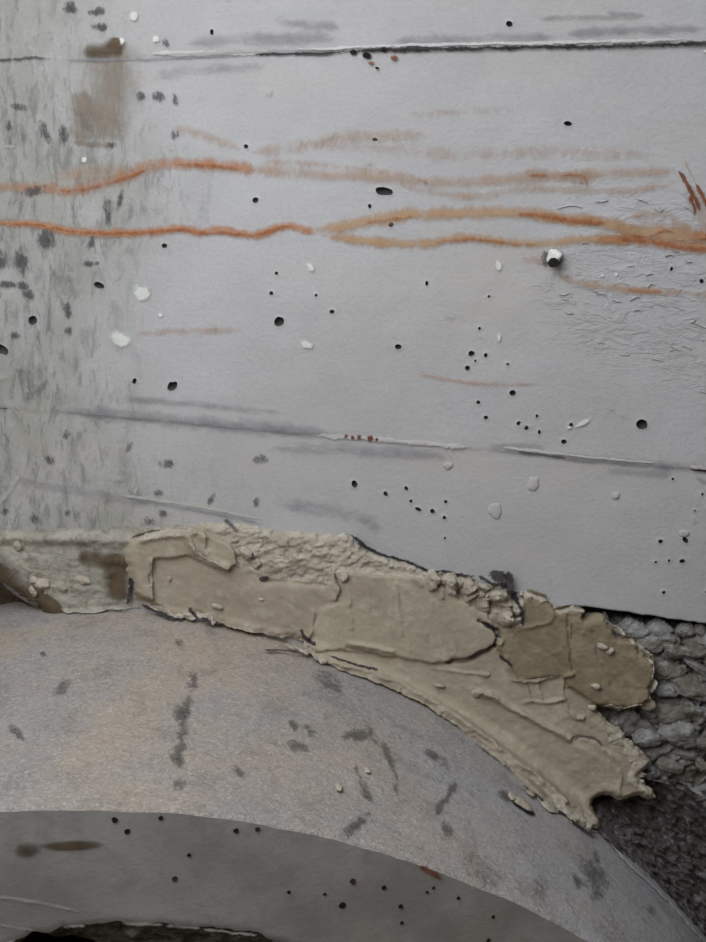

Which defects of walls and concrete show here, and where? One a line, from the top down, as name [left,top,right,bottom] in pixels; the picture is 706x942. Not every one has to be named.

crack [0,54,50,62]
damp [86,38,122,57]
crack [77,38,706,69]
rust [11,159,251,193]
rust [0,220,312,239]
rust [326,207,706,252]
crack [273,431,466,449]
crack [498,446,706,472]
spalling [579,606,706,683]
spalling [597,677,706,797]